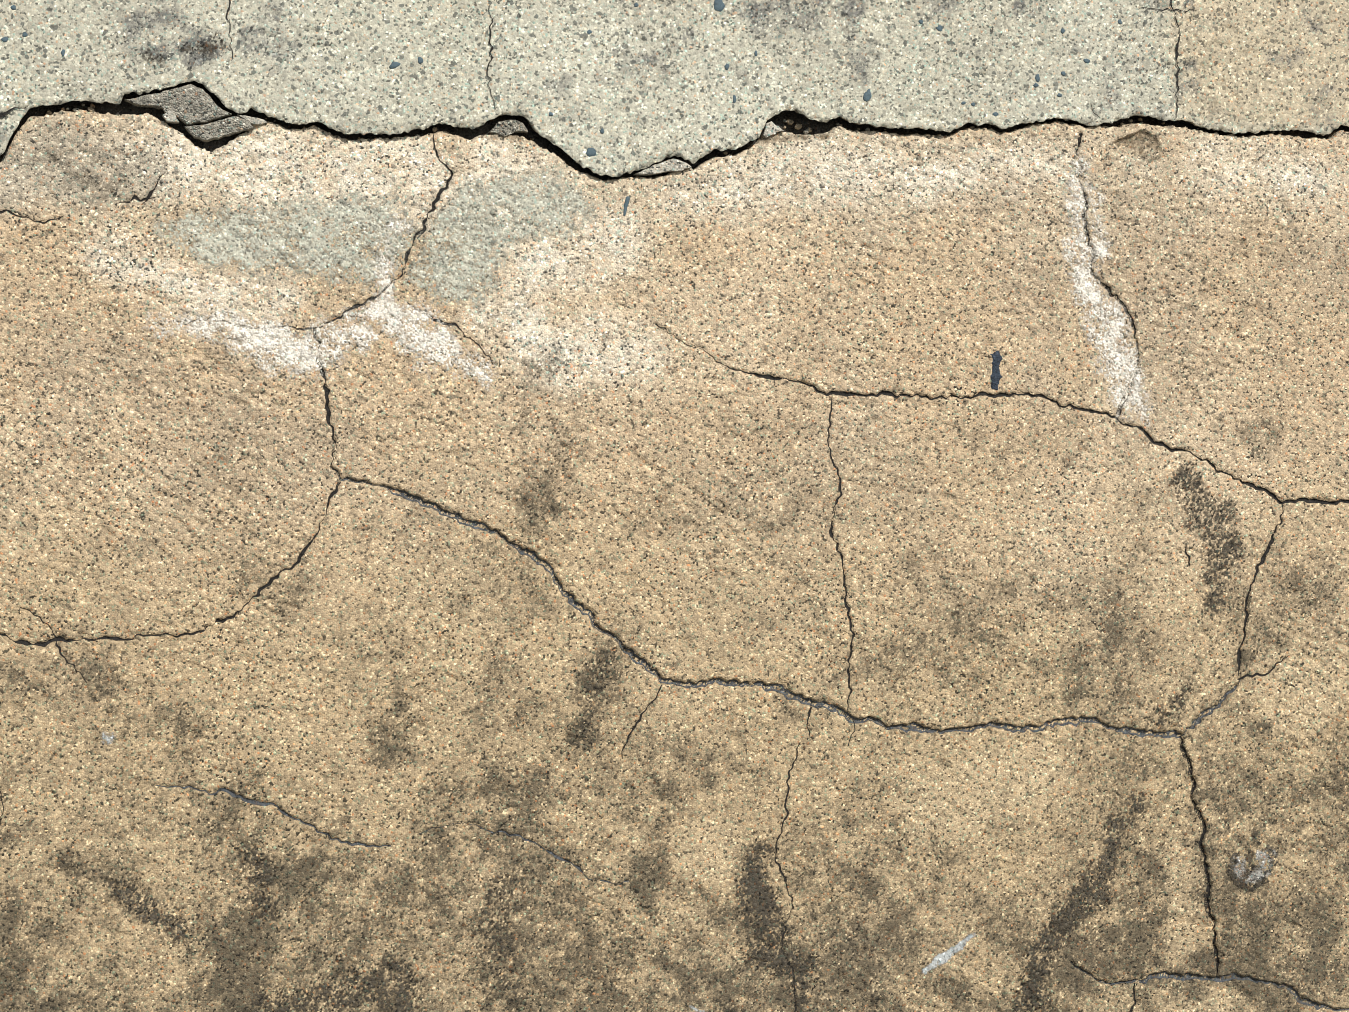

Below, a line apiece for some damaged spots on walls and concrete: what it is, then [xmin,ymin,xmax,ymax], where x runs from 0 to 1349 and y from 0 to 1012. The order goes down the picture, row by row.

peeling [90,84,301,142]
leakage [147,213,493,387]
crack [0,81,762,352]
crack [407,302,493,364]
crack [765,0,1349,389]
leakage [1062,152,1151,424]
crack [0,324,1349,1012]